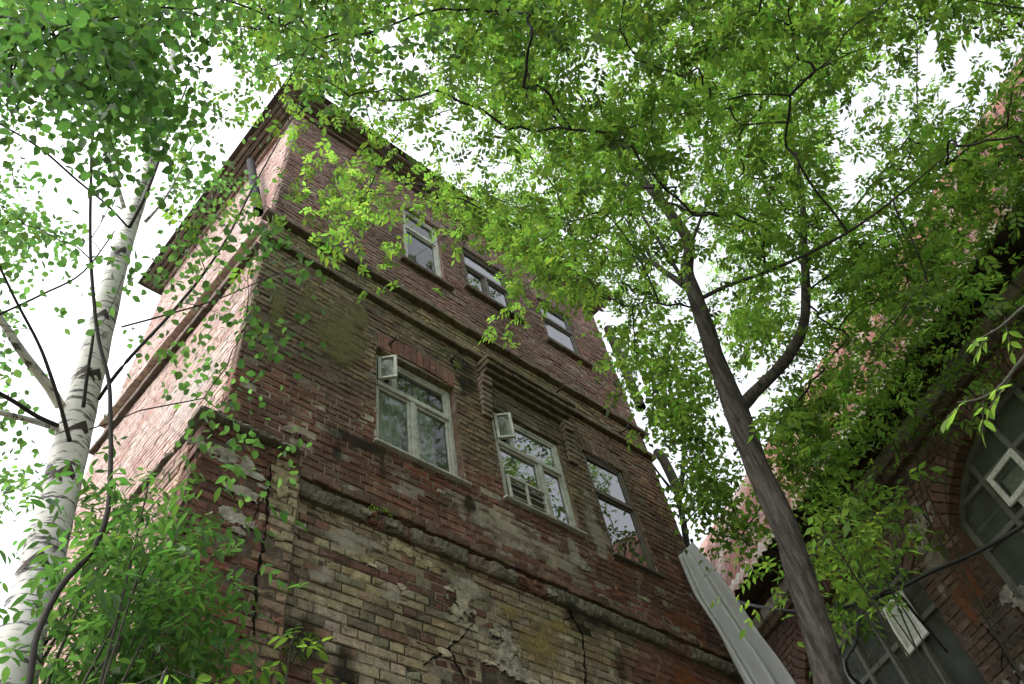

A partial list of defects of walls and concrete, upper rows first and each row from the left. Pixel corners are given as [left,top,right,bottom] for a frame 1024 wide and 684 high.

flaking render [174,430,293,538]
crack [251,461,272,635]
spalling [319,520,541,684]
crack [417,624,473,679]
crack [563,610,587,684]